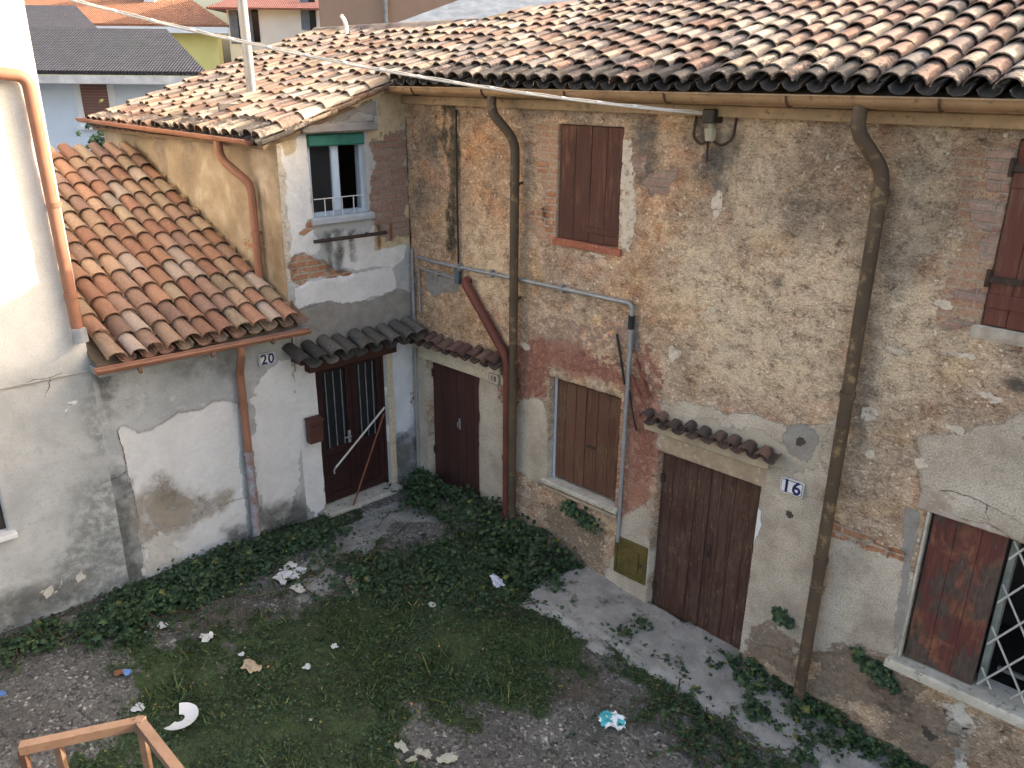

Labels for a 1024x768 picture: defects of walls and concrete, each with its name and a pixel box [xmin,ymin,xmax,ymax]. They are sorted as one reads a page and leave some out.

spalling [274,143,352,286]
spalling [368,130,410,242]
water stain [441,96,460,256]
spalling [963,145,1017,261]
peeling [117,359,326,576]
peeling [499,313,664,518]
peeling [831,506,920,650]
crack [940,490,1018,522]